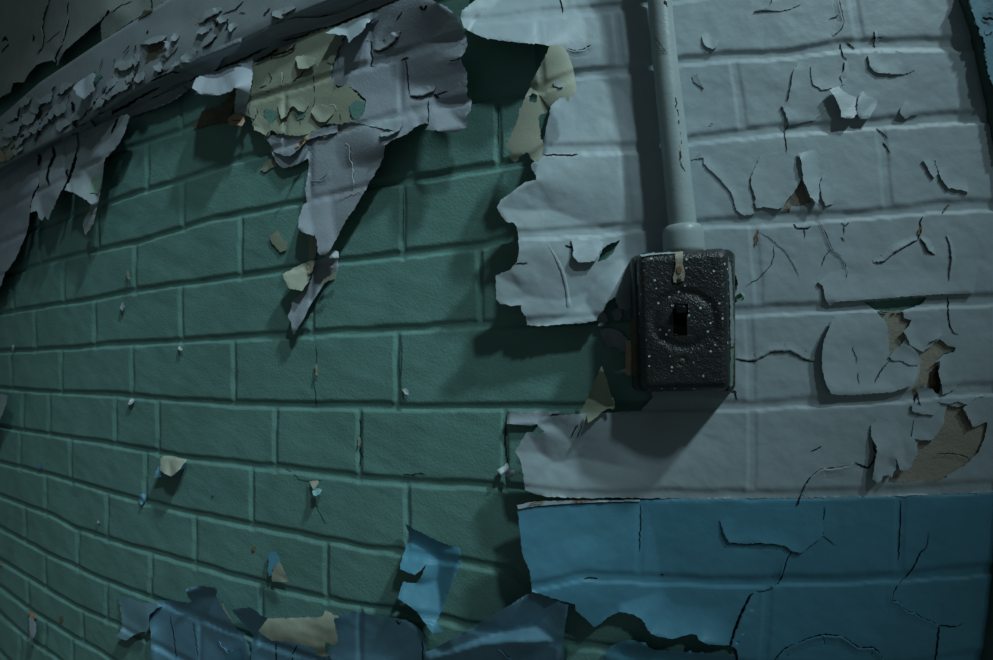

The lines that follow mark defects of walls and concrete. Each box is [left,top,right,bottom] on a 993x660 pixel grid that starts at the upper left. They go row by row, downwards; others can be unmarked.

crack [830,0,882,85]
peeling [0,0,668,334]
peeling [507,0,993,500]
crack [748,233,797,285]
crack [793,214,849,280]
crack [872,217,958,335]
crack [736,341,818,363]
peeling [153,456,187,478]
peeling [115,492,993,660]
crack [730,442,883,660]
crack [886,508,961,660]